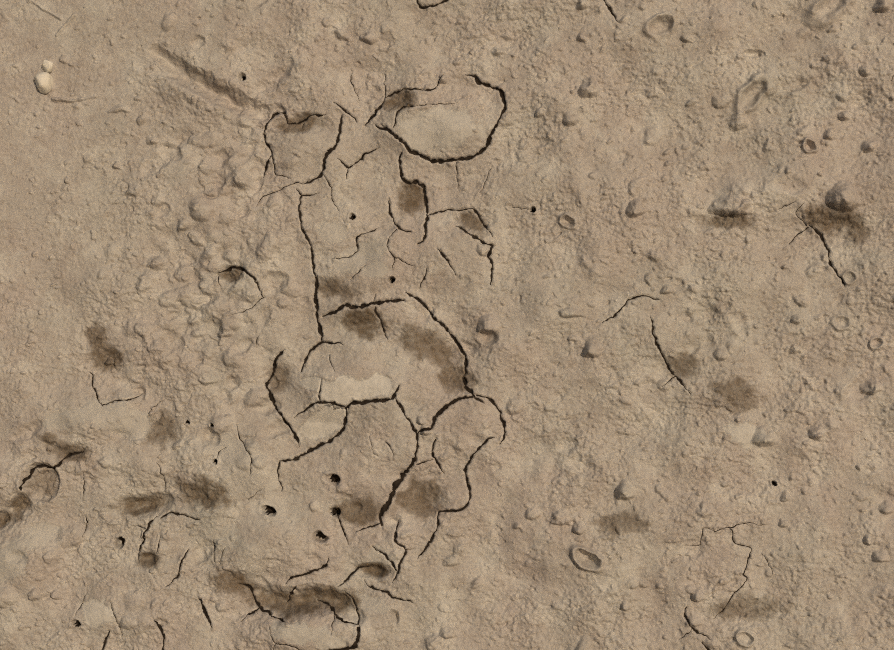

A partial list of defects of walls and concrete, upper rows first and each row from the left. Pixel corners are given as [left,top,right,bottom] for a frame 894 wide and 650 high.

crack [417,0,449,9]
crack [780,202,845,286]
crack [90,372,161,414]
crack [216,70,506,650]
crack [602,295,691,394]
crack [19,451,84,490]
crack [682,522,773,650]